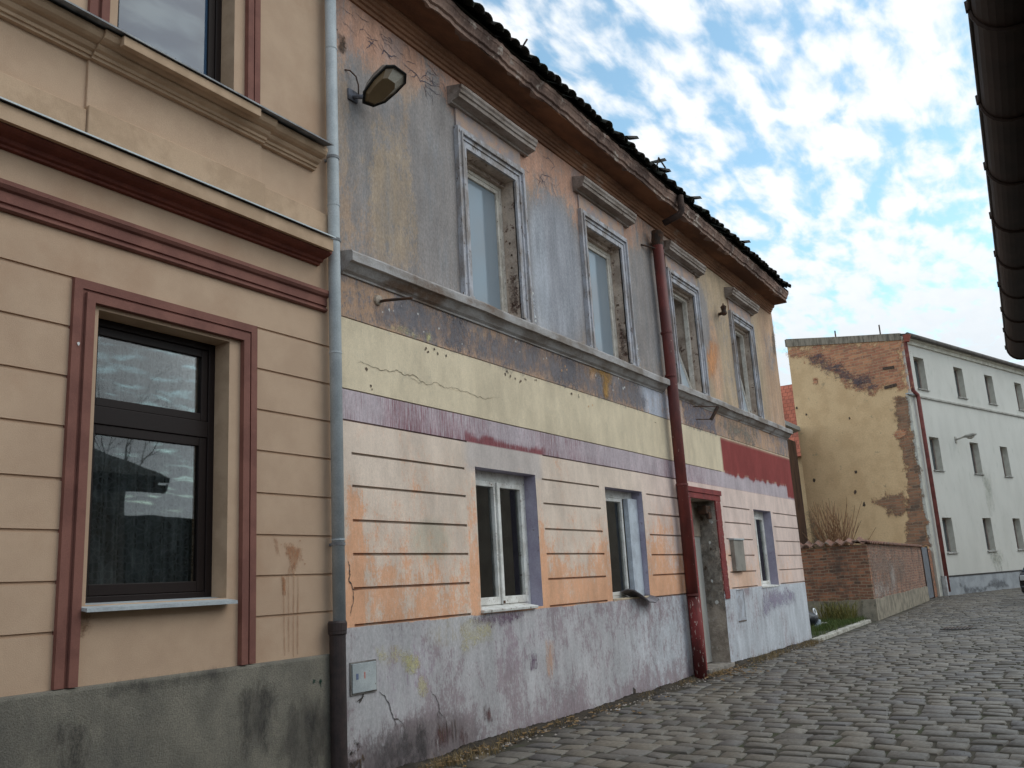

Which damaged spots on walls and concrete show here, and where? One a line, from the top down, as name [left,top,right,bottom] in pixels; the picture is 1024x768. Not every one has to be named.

crack [343,10,447,99]
crack [358,362,493,399]
spalling [788,340,931,548]
crack [357,693,405,729]